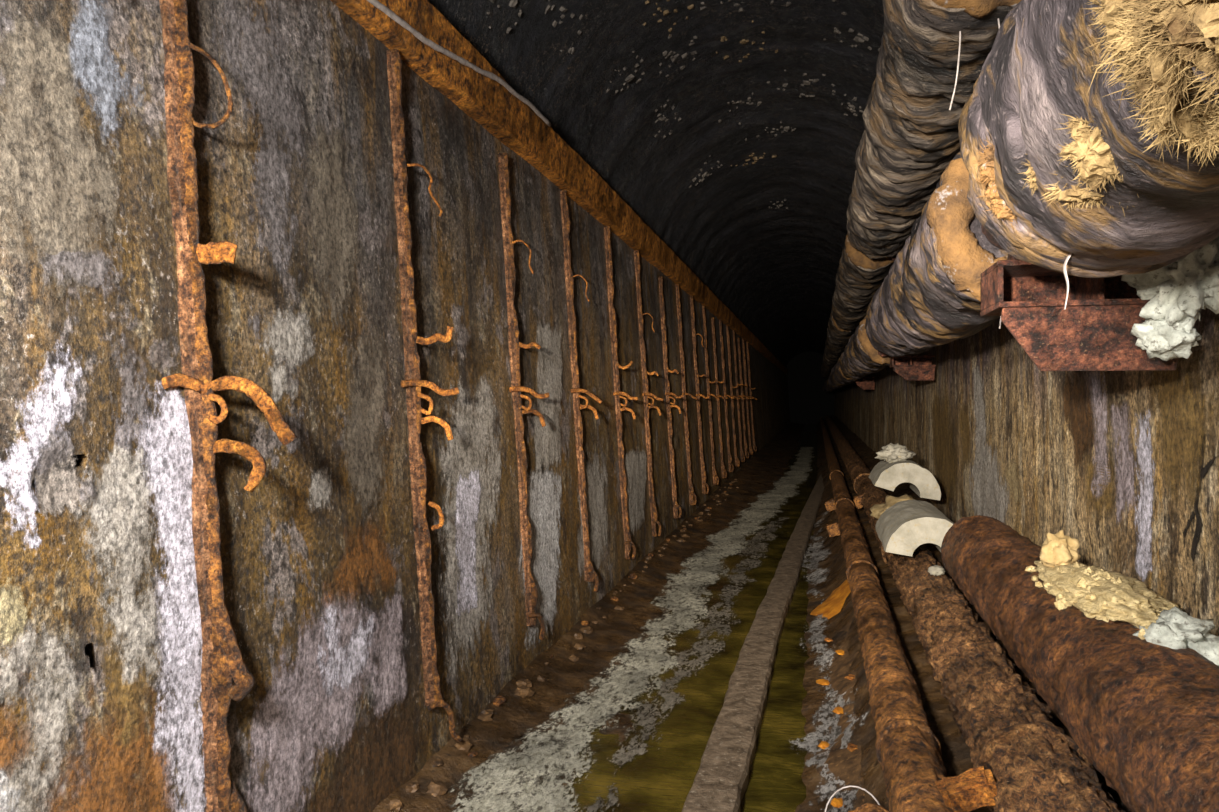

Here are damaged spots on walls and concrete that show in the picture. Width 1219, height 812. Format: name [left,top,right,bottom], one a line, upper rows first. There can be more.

damp [212,0,358,329]
damp [79,334,207,812]
damp [245,335,427,812]
damp [438,377,501,677]
damp [519,322,562,647]
damp [450,447,815,812]
corrosion [810,579,865,805]
corrosion [1063,373,1113,515]
damp [1089,371,1155,579]
corrosion [1151,359,1214,500]
crack [1183,434,1216,562]